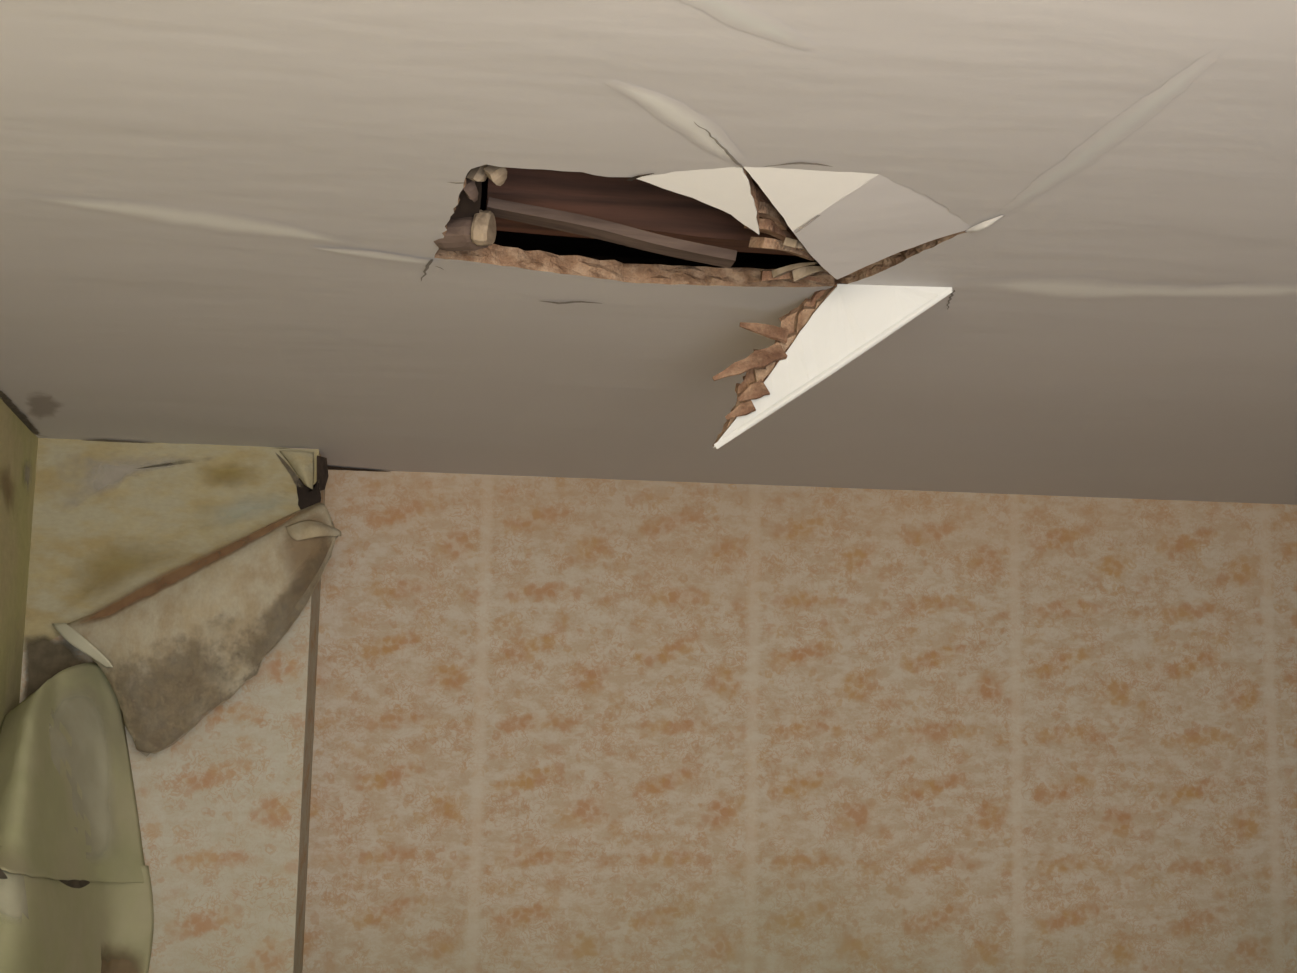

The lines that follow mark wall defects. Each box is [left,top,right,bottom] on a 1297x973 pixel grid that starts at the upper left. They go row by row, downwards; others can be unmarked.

spalling [434,178,966,287]
flaking render [23,438,320,650]